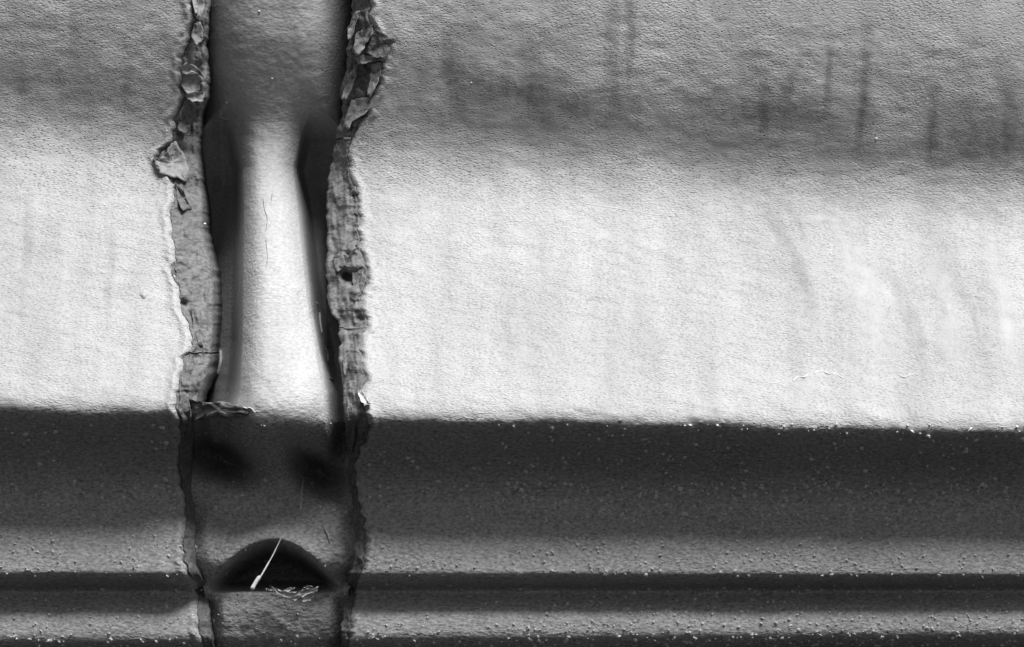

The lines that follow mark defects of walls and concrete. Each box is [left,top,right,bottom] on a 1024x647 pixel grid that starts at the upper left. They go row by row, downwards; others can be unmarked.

spalling [153,0,248,647]
spalling [325,0,396,647]